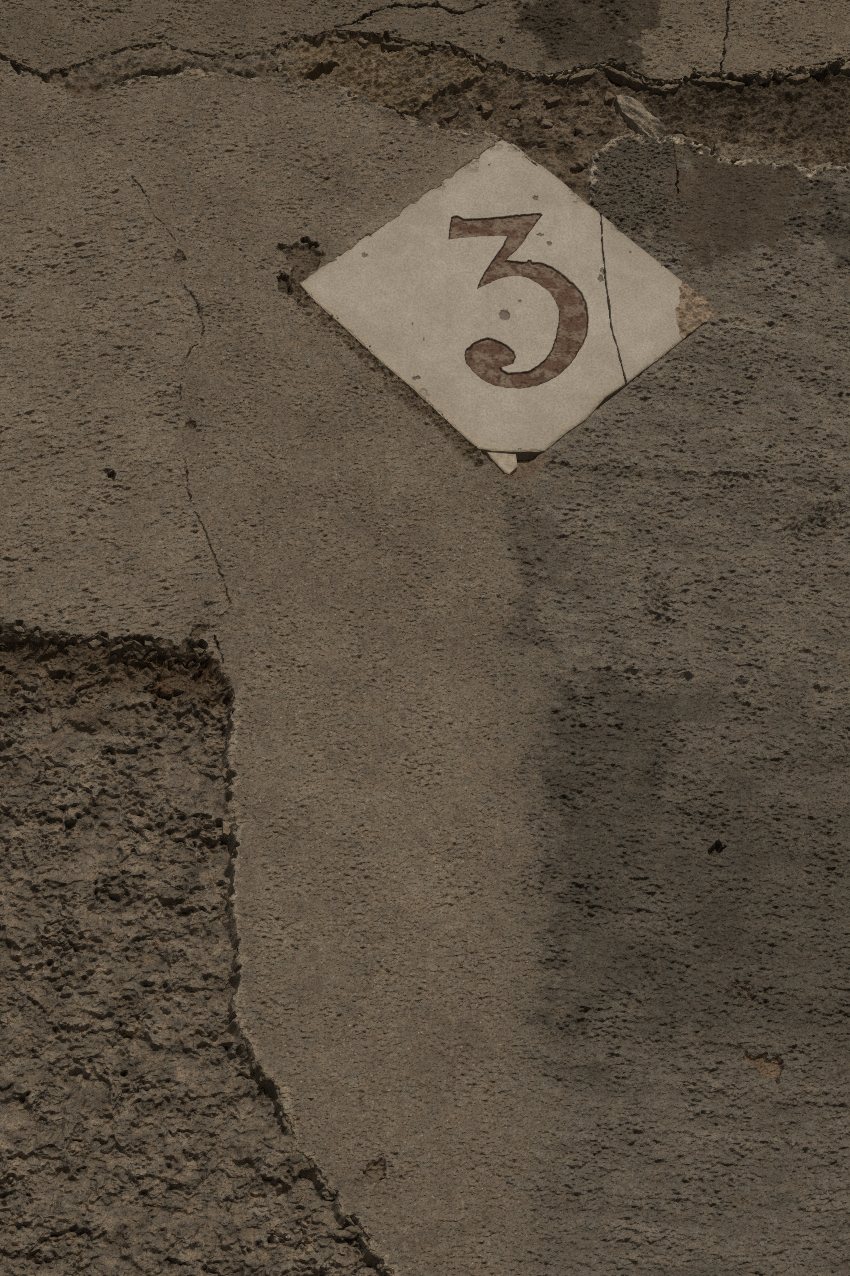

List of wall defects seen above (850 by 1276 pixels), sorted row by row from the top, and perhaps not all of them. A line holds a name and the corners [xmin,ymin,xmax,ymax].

spalling [120,27,850,203]
crack [720,0,731,72]
crack [600,215,627,387]
crack [132,175,232,605]
crack [214,634,224,664]
spalling [0,617,395,1276]